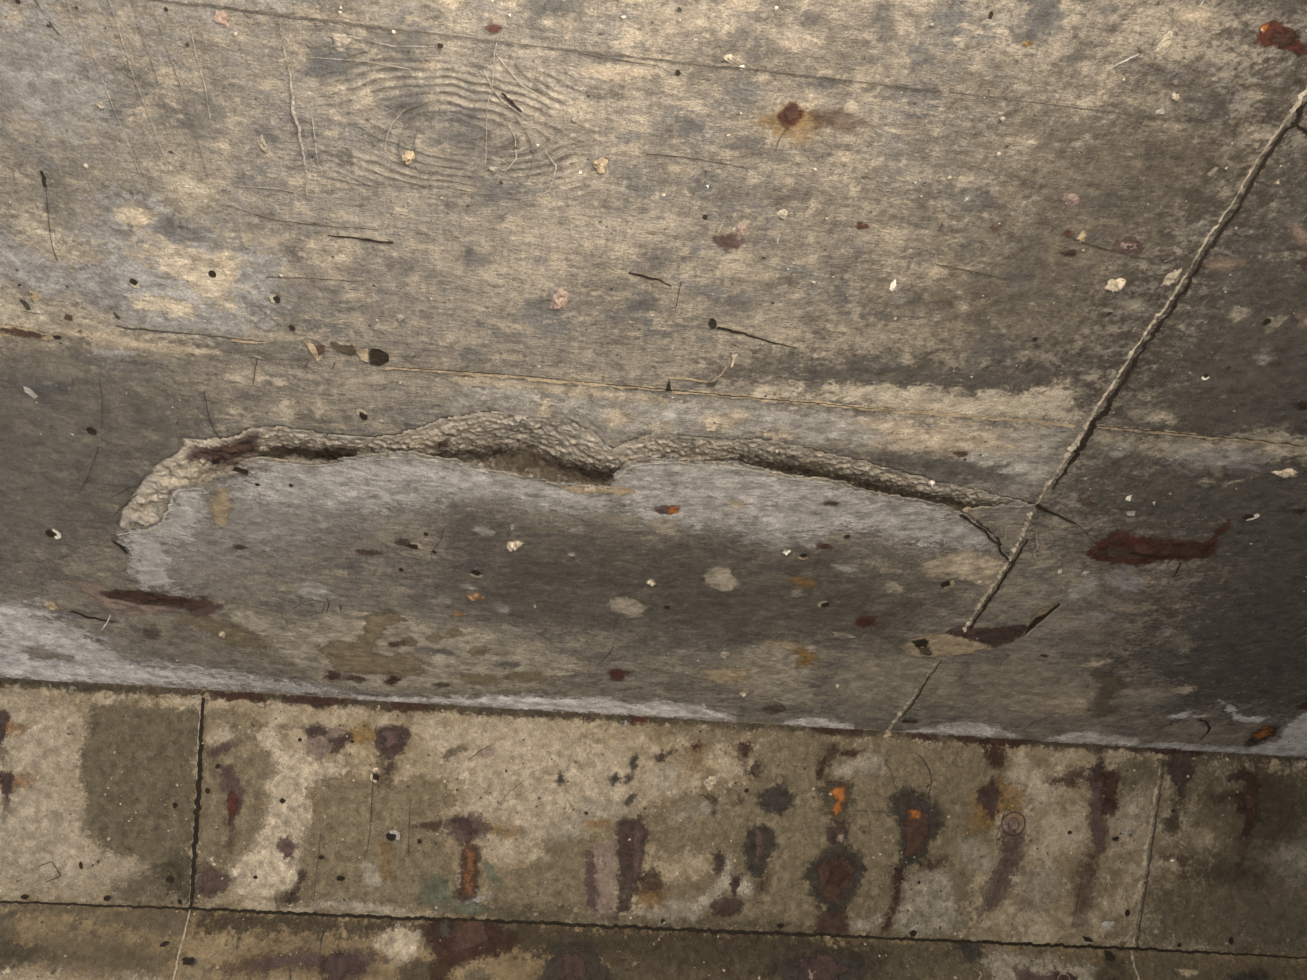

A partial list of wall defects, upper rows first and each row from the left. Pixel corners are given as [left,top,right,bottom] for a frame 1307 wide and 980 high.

crack [1035,102,1307,541]
spalling [117,411,1037,536]
spalling [408,532,437,554]
crack [731,453,1028,631]
crack [903,661,942,716]
spalling [901,633,989,657]
crack [1155,717,1236,748]
water stain [78,700,276,903]
rust [415,812,514,903]
rust [584,814,667,918]
rust [801,727,868,936]
rust [882,786,945,931]